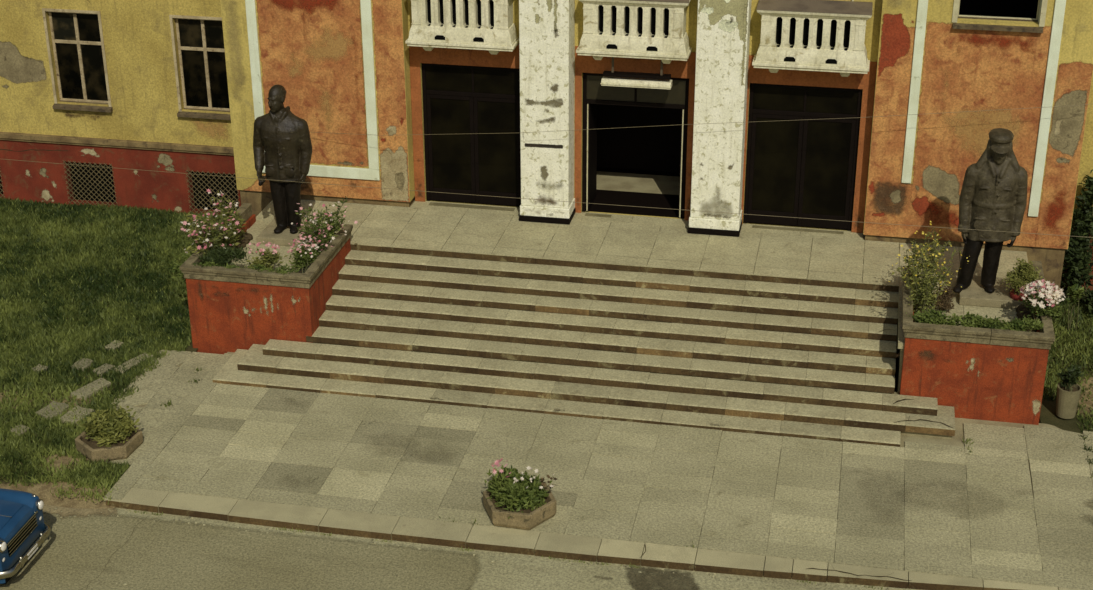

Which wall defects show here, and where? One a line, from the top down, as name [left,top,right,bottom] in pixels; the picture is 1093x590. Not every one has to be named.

flaking render [0,41,46,89]
flaking render [535,0,559,37]
flaking render [698,0,748,85]
spalling [525,99,563,123]
spalling [1049,89,1087,163]
peeling [157,153,175,171]
flaking render [380,118,421,202]
leakage [869,182,906,217]
spalling [912,165,960,227]
leakage [627,567,699,590]